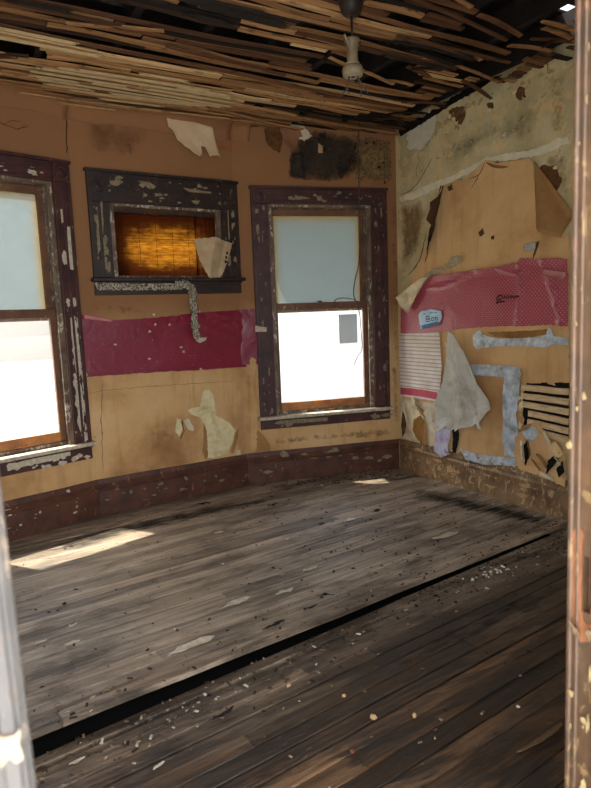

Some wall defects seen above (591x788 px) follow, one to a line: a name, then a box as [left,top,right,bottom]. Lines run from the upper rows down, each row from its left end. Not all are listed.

peeling [167,118,232,157]
peeling [398,75,502,151]
peeling [400,106,580,203]
spalling [512,82,530,101]
peeling [60,209,78,270]
peeling [93,202,111,273]
peeling [139,181,168,202]
peeling [169,182,236,244]
peeling [66,297,88,442]
flaking render [175,390,241,459]
peeling [6,452,91,471]